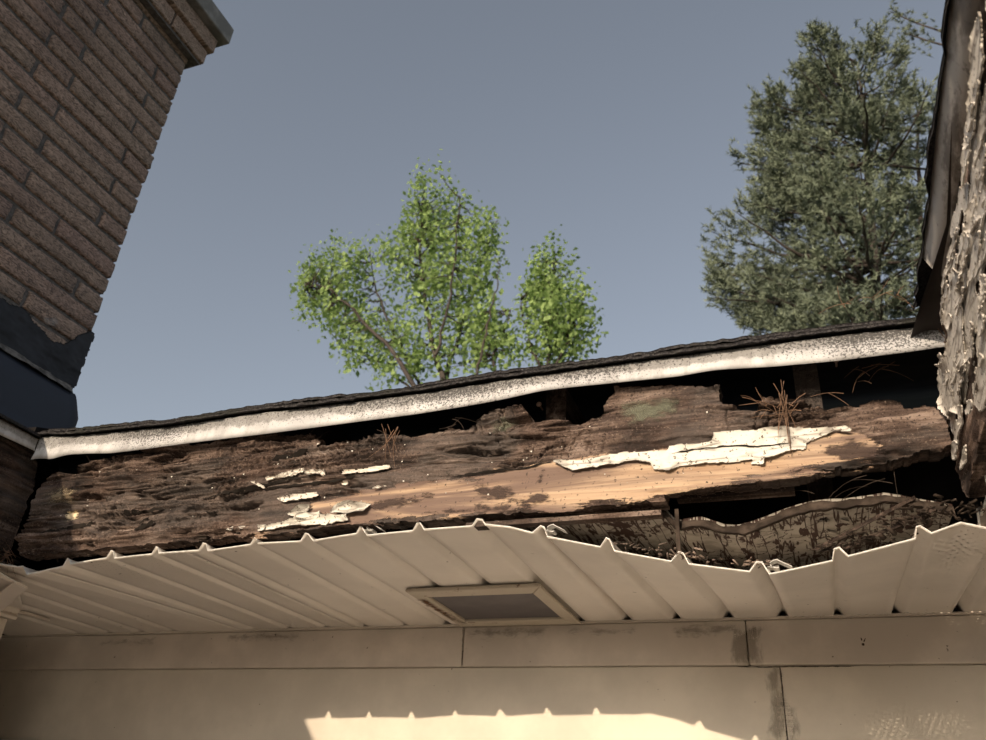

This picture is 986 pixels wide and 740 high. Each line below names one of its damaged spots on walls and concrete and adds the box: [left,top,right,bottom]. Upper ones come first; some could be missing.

peeling [934,0,986,470]
peeling [226,425,883,539]